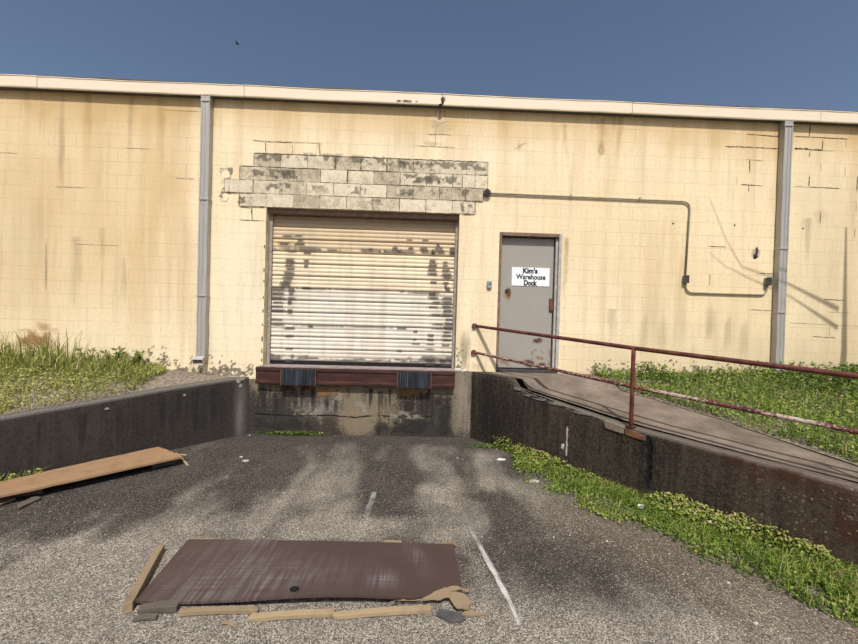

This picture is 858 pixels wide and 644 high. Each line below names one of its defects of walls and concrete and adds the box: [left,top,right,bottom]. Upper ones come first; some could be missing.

peeling [219,153,488,215]
crack [726,125,858,210]
leakage [255,388,349,429]
leakage [356,389,450,434]